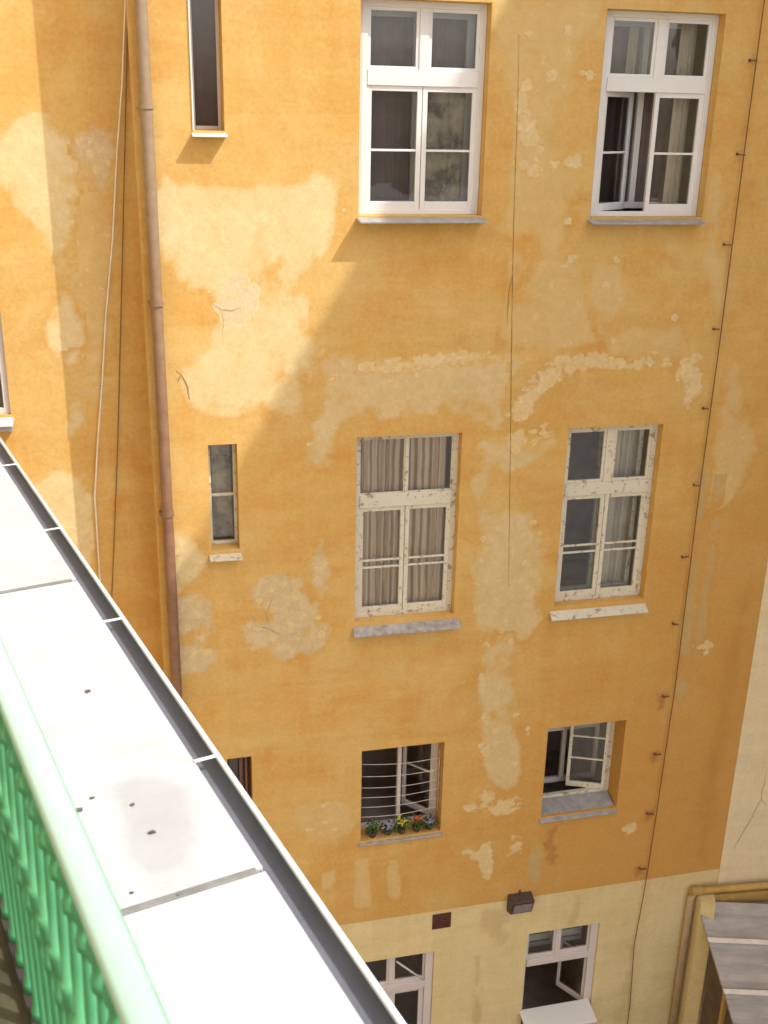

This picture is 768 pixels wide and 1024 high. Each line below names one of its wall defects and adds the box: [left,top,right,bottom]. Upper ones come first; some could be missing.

peeling [509,69,583,178]
peeling [0,108,120,439]
peeling [31,460,100,570]
peeling [156,168,704,817]
water stain [102,771,216,892]
peeling [461,834,524,881]